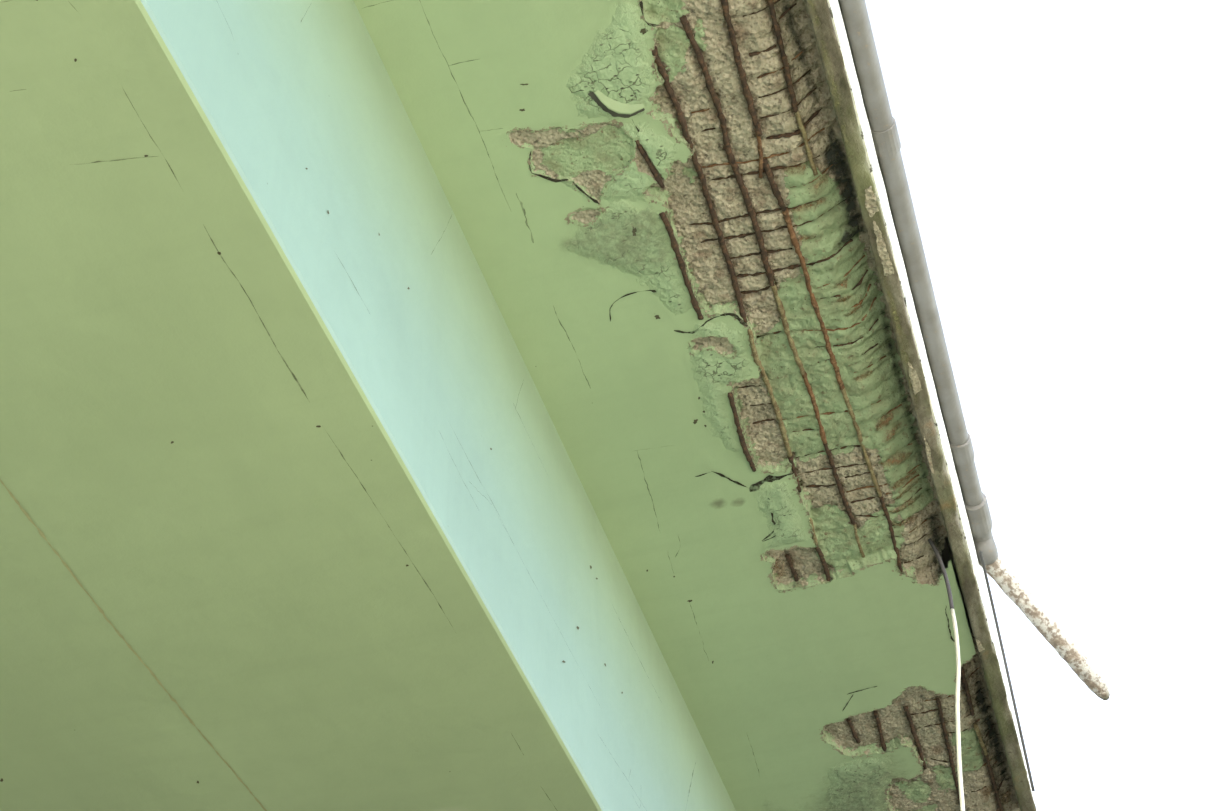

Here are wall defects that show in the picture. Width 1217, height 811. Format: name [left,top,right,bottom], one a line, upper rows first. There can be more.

crack [86,93,175,175]
crack [419,0,599,243]
crack [210,238,307,397]
spalling [506,0,948,593]
corrosion [880,452,920,526]
spalling [819,631,1021,811]